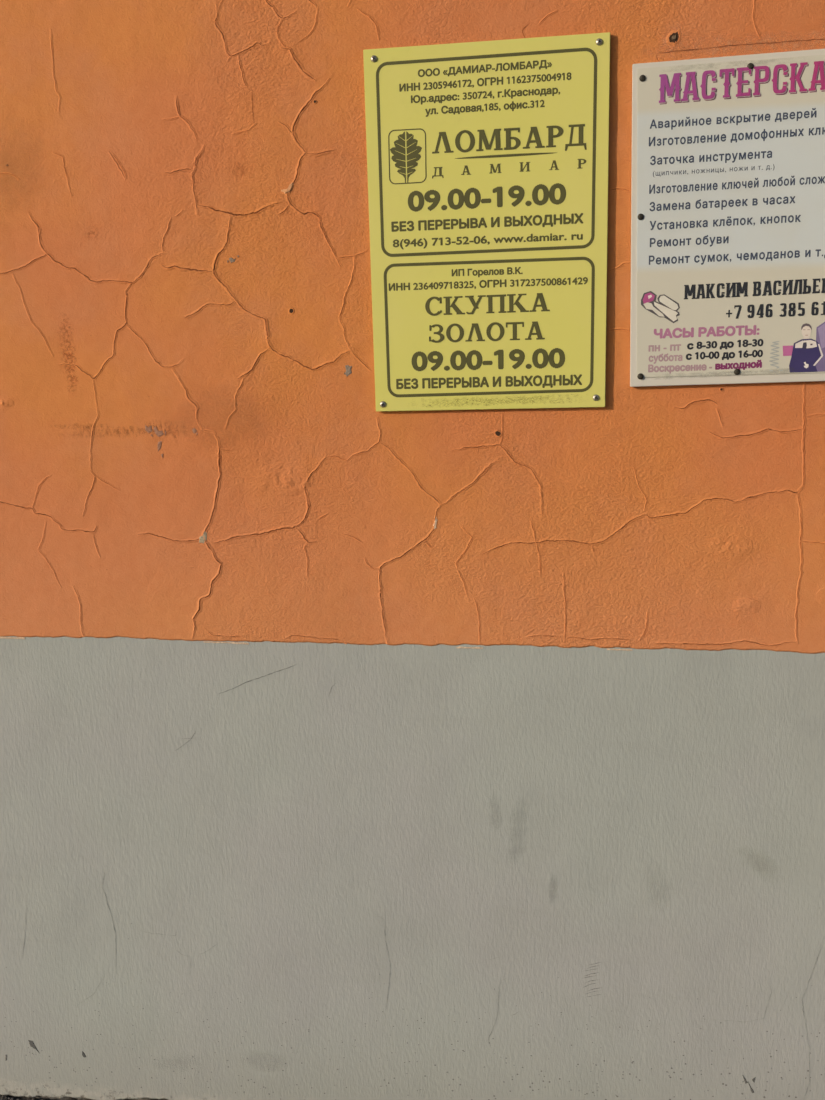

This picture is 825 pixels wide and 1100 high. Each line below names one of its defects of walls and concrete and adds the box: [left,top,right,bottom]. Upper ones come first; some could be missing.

crack [0,0,825,647]